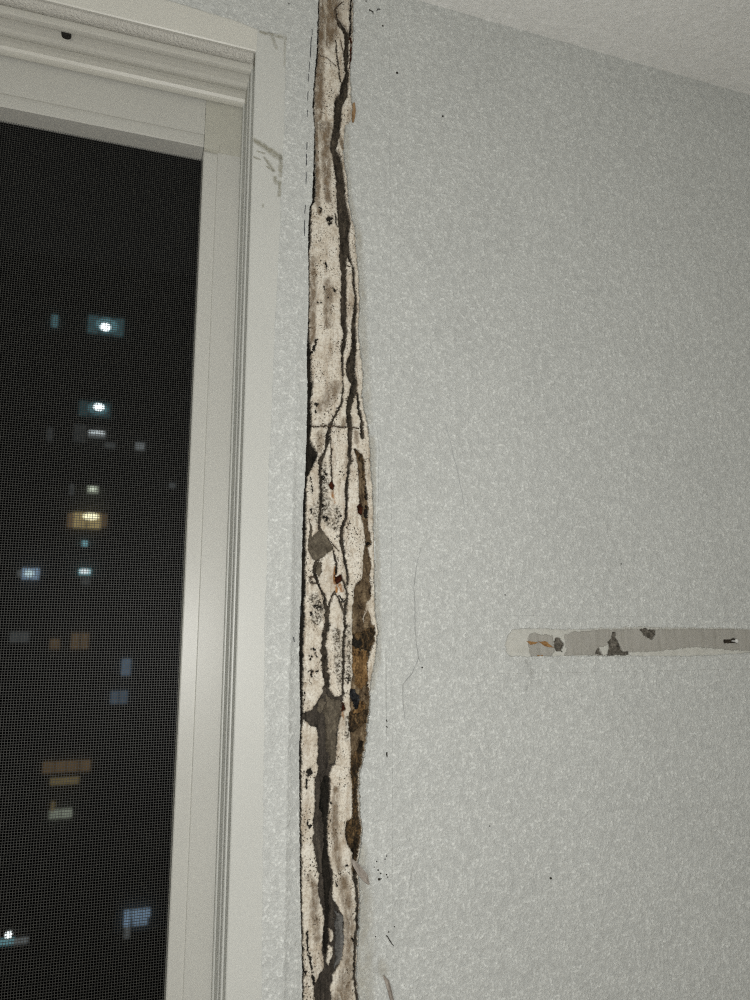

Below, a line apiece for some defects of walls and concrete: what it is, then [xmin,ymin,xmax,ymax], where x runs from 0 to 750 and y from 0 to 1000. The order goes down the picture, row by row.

damp [315,0,344,214]
damp [311,261,331,343]
damp [313,462,340,529]
peeling [300,0,378,1000]
damp [333,624,351,682]
flaking render [595,632,628,656]
flaking render [640,628,655,640]
damp [333,787,352,1000]